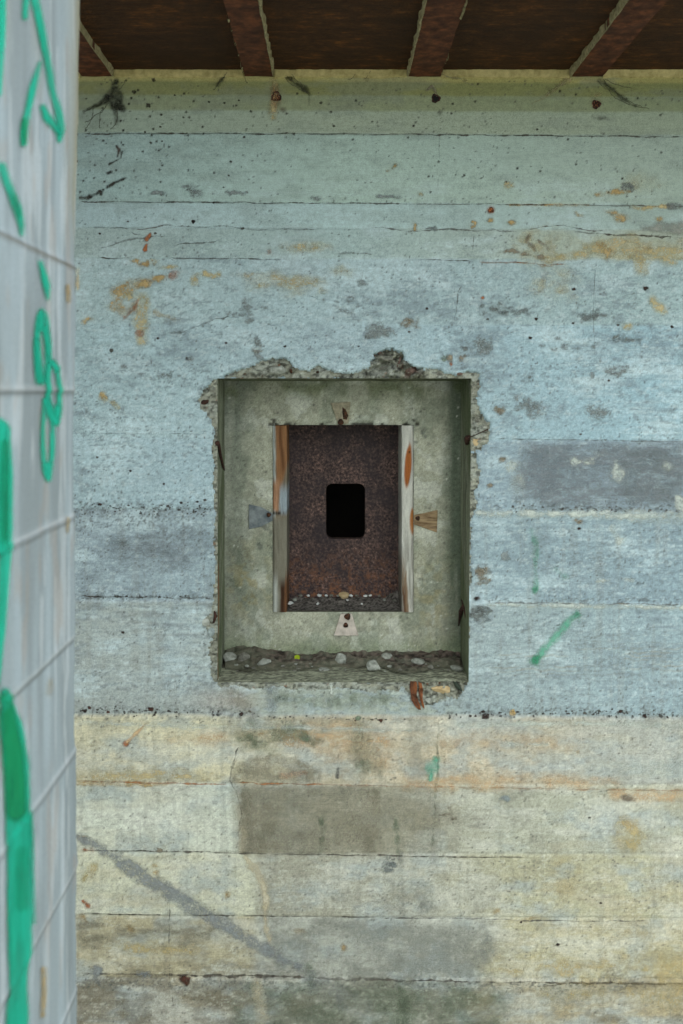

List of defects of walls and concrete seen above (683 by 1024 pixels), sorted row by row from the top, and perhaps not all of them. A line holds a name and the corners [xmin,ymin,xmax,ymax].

rust [110,233,175,344]
spalling [81,338,505,682]
rust [409,681,424,710]